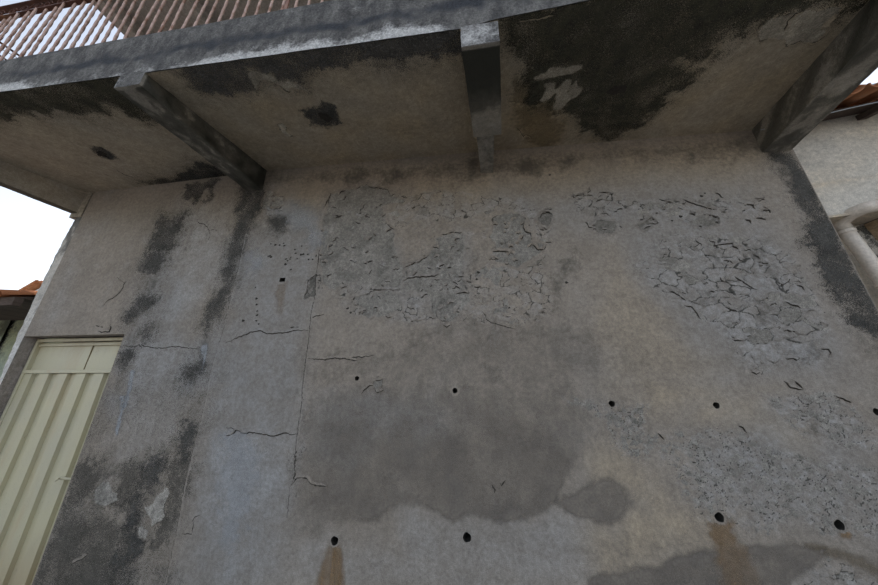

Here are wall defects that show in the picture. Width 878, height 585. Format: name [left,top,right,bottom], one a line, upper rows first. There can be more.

water stain [0,77,171,138]
water stain [171,30,464,129]
water stain [498,0,869,143]
water stain [126,152,227,278]
water stain [174,182,289,394]
water stain [33,417,208,585]
water stain [113,294,160,434]
crack [96,222,375,585]
water stain [326,422,628,524]
peeling [552,187,878,585]